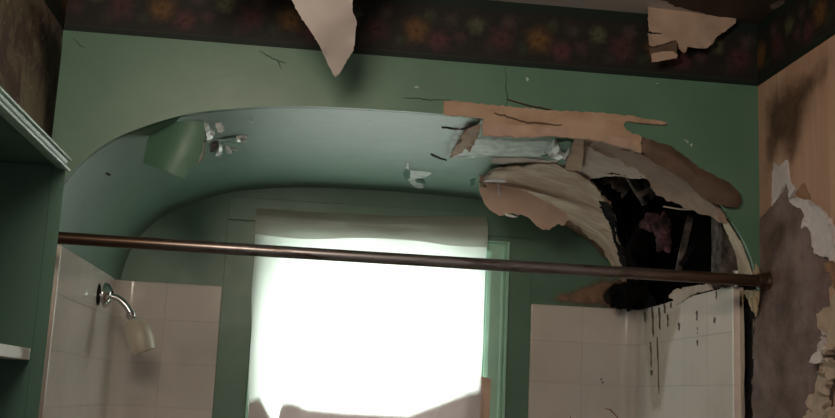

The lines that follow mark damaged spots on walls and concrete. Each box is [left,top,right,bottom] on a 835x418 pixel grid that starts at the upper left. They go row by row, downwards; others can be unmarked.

peeling [662,0,786,24]
damp [41,25,62,138]
peeling [144,121,247,179]
peeling [403,163,432,188]
peeling [430,124,574,168]
damp [768,79,813,156]
spalling [576,144,696,270]
spalling [626,279,743,310]
flaking render [711,184,833,418]
peeling [480,376,491,418]